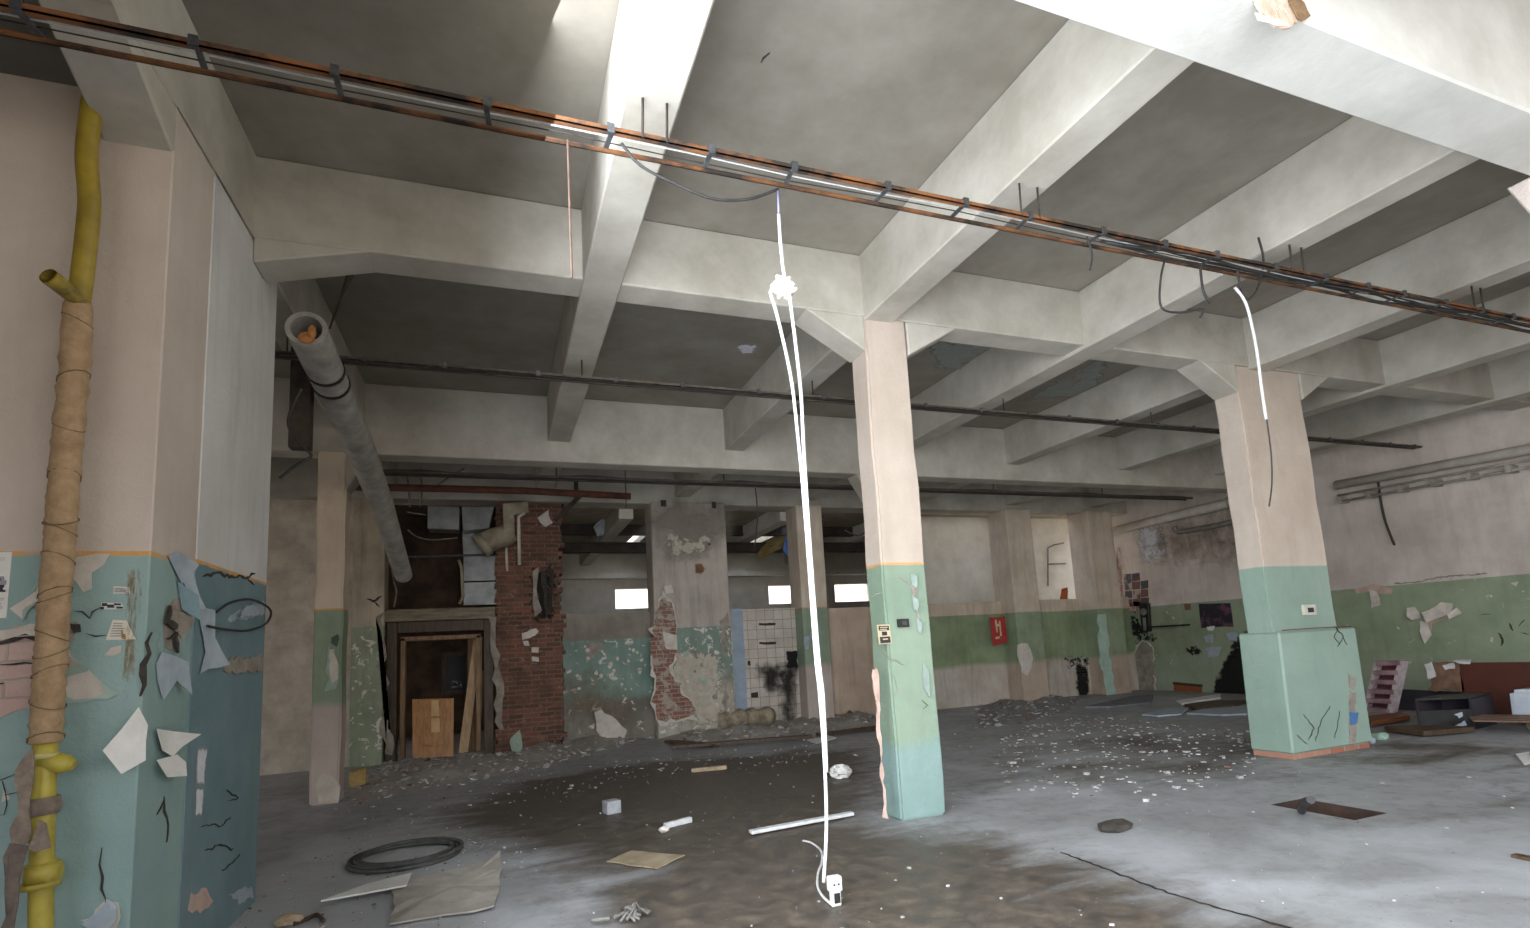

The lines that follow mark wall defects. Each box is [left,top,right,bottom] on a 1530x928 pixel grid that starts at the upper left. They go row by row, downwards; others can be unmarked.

spalling [1253,0,1311,30]
peeling [74,553,110,592]
peeling [1354,584,1394,608]
peeling [1407,602,1462,644]
flaking render [0,579,39,718]
peeling [65,621,118,704]
flaking render [576,591,729,726]